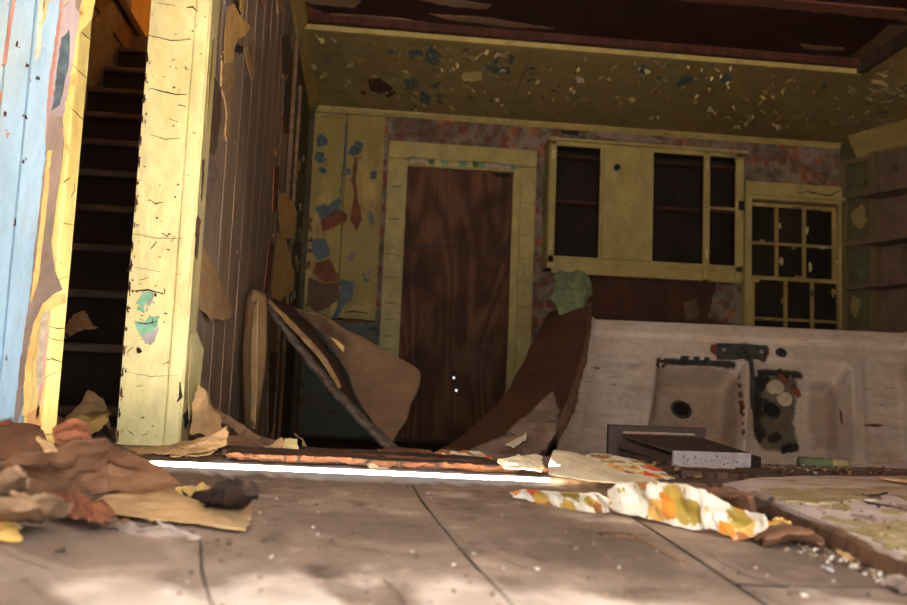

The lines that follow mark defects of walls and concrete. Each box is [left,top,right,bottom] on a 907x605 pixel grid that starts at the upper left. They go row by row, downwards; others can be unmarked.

peeling [1,0,20,67]
peeling [25,0,53,67]
peeling [79,0,95,37]
peeling [305,0,907,58]
spalling [141,52,189,124]
peeling [199,0,255,141]
peeling [263,113,374,319]
spalling [122,241,167,356]
peeling [194,215,232,321]